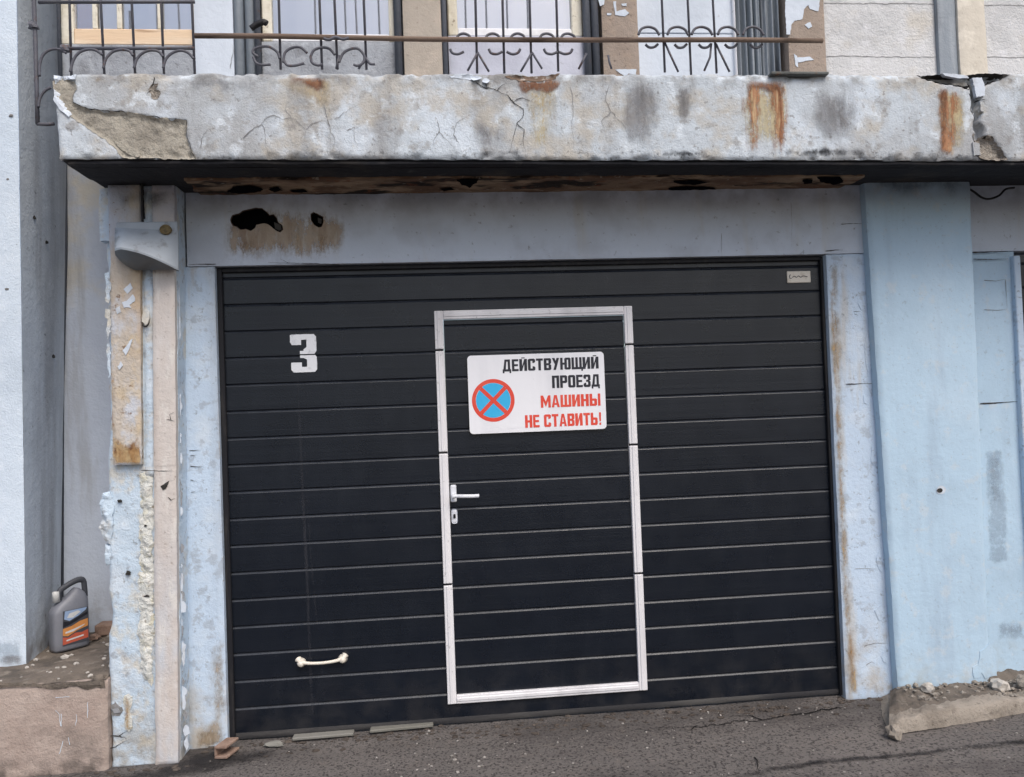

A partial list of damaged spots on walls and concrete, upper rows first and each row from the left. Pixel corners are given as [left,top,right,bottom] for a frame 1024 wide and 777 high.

spalling [53,74,196,160]
crack [244,101,359,147]
crack [476,76,534,152]
leakage [627,90,652,135]
leakage [680,92,689,115]
rust [747,82,787,146]
rust [939,90,962,152]
peeling [941,73,985,98]
spalling [973,134,1008,161]
peeling [105,272,135,377]